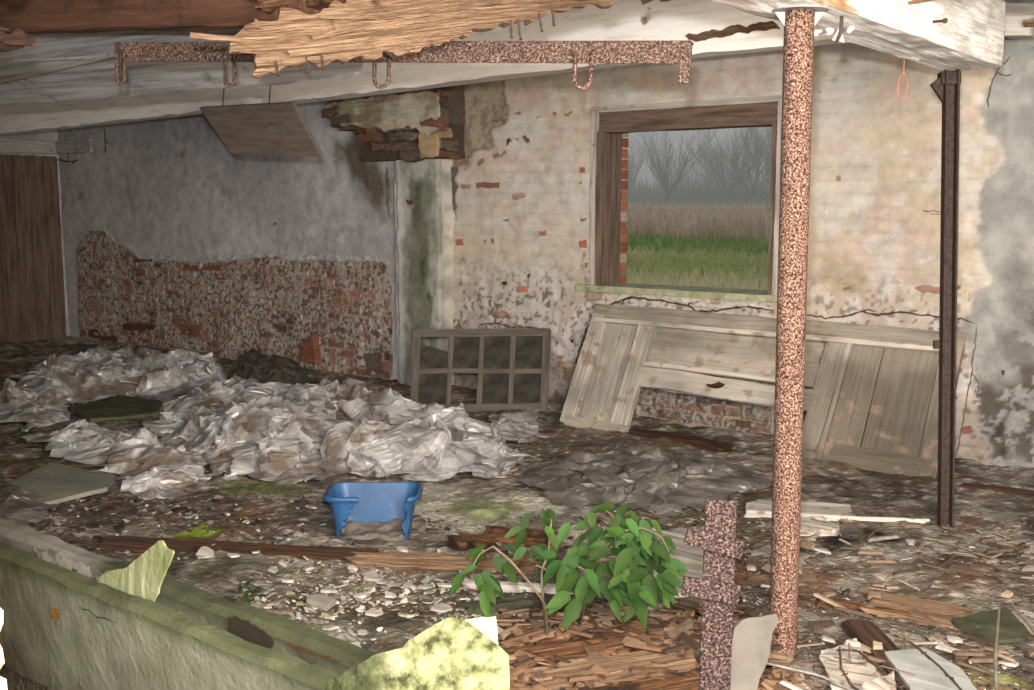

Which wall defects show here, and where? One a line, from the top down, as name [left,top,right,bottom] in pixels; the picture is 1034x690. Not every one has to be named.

spalling [321,85,465,163]
spalling [76,225,394,380]
crack [609,296,770,312]
crack [564,325,589,404]